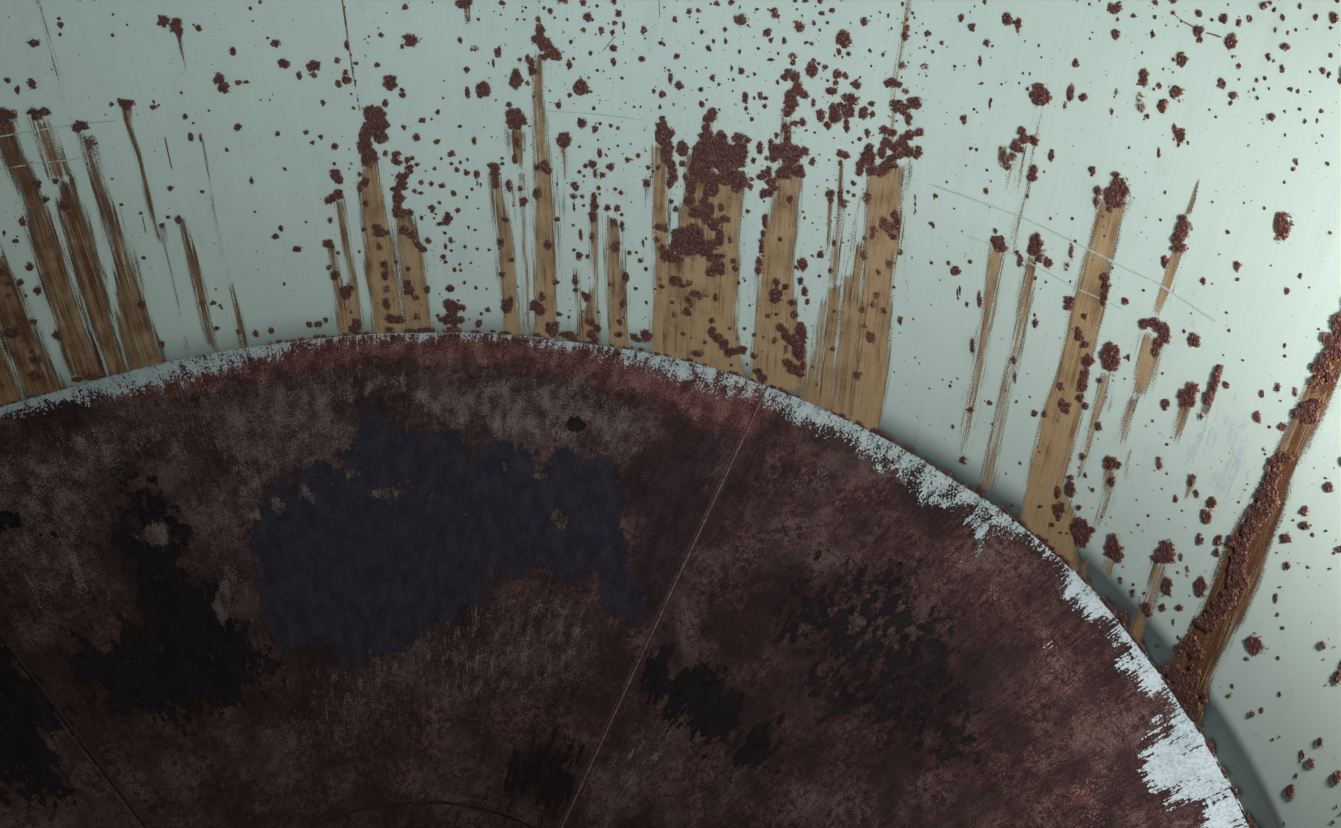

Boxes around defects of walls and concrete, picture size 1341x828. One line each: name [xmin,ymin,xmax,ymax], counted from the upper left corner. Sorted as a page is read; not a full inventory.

rust [672,0,728,51]
rust [401,97,444,142]
rust [183,113,225,257]
rust [1173,473,1218,525]
peeling [0,332,1249,828]